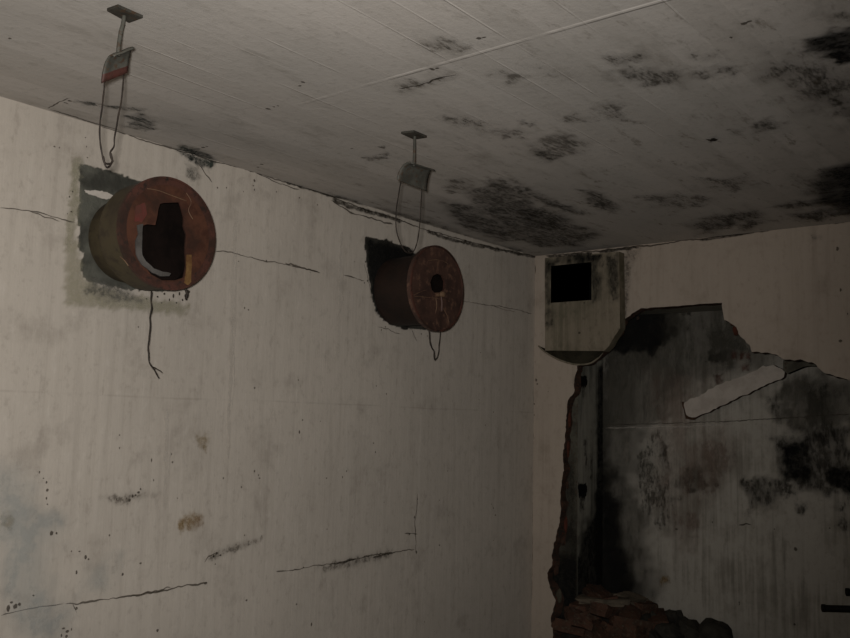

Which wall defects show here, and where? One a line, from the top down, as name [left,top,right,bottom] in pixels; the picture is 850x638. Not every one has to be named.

water stain [808,27,850,64]
crack [5,191,73,222]
crack [49,98,764,273]
water stain [397,180,629,303]
water stain [781,164,850,222]
spalling [620,303,738,337]
spalling [548,352,669,638]
water stain [553,297,762,620]
water stain [740,373,850,505]
crack [277,497,418,572]
crack [3,582,207,615]